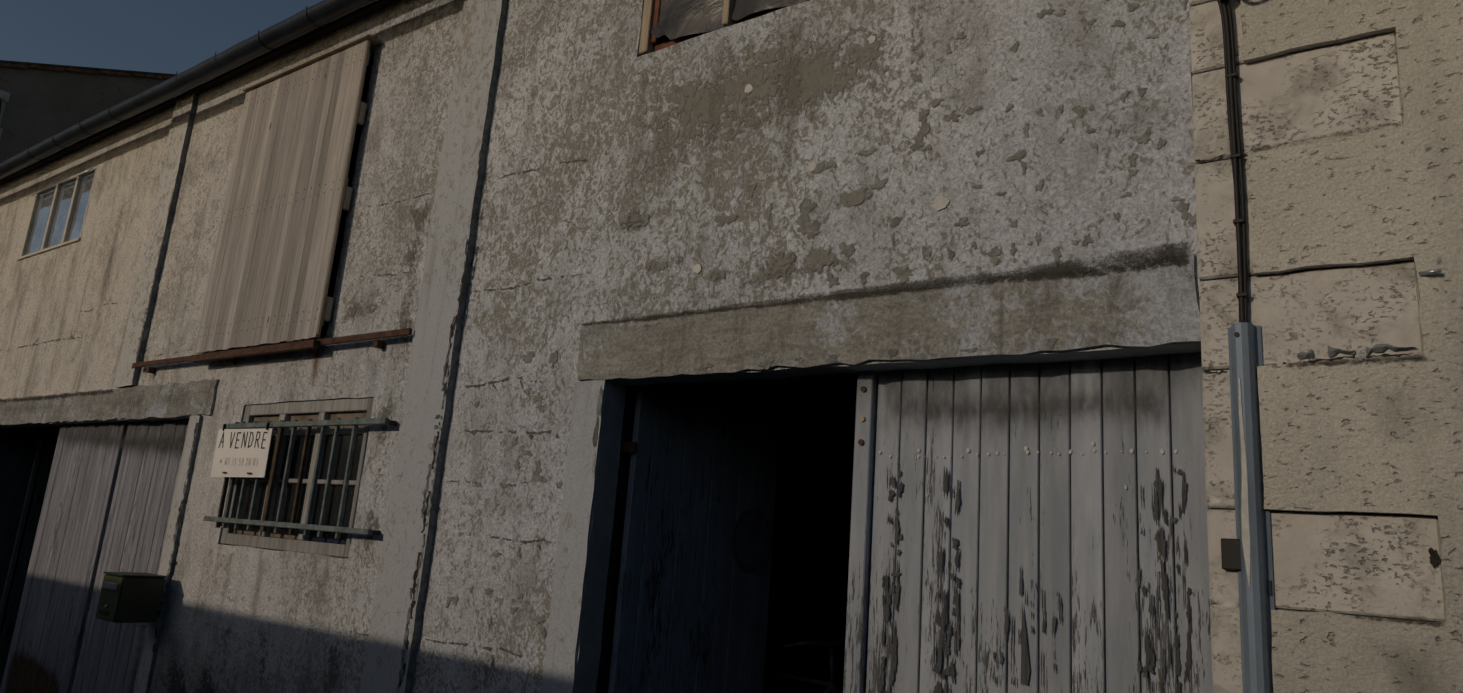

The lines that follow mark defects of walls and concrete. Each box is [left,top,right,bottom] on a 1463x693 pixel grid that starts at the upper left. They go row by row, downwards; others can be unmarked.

damp [639,0,923,184]
crack [397,152,608,693]
peeling [877,462,903,693]
peeling [933,466,960,693]
peeling [993,566,1061,693]